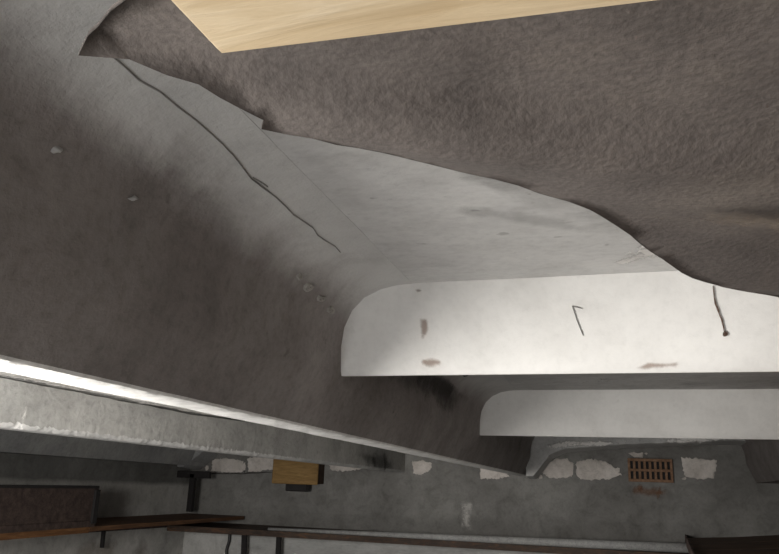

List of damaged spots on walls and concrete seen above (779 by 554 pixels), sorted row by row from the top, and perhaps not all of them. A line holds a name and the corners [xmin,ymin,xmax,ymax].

crack [114,58,340,252]
peeling [205,457,273,473]
peeling [412,460,432,475]
peeling [480,468,509,479]
peeling [539,458,621,480]
peeling [681,457,717,480]